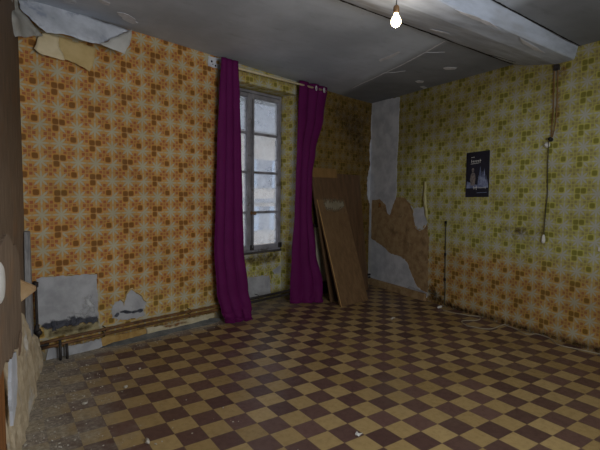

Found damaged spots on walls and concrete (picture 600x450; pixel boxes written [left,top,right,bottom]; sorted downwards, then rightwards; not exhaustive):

peeling [57,36,96,71]
peeling [367,97,429,298]
flaking render [36,273,99,325]
flaking render [112,288,147,320]
damp [42,316,100,339]